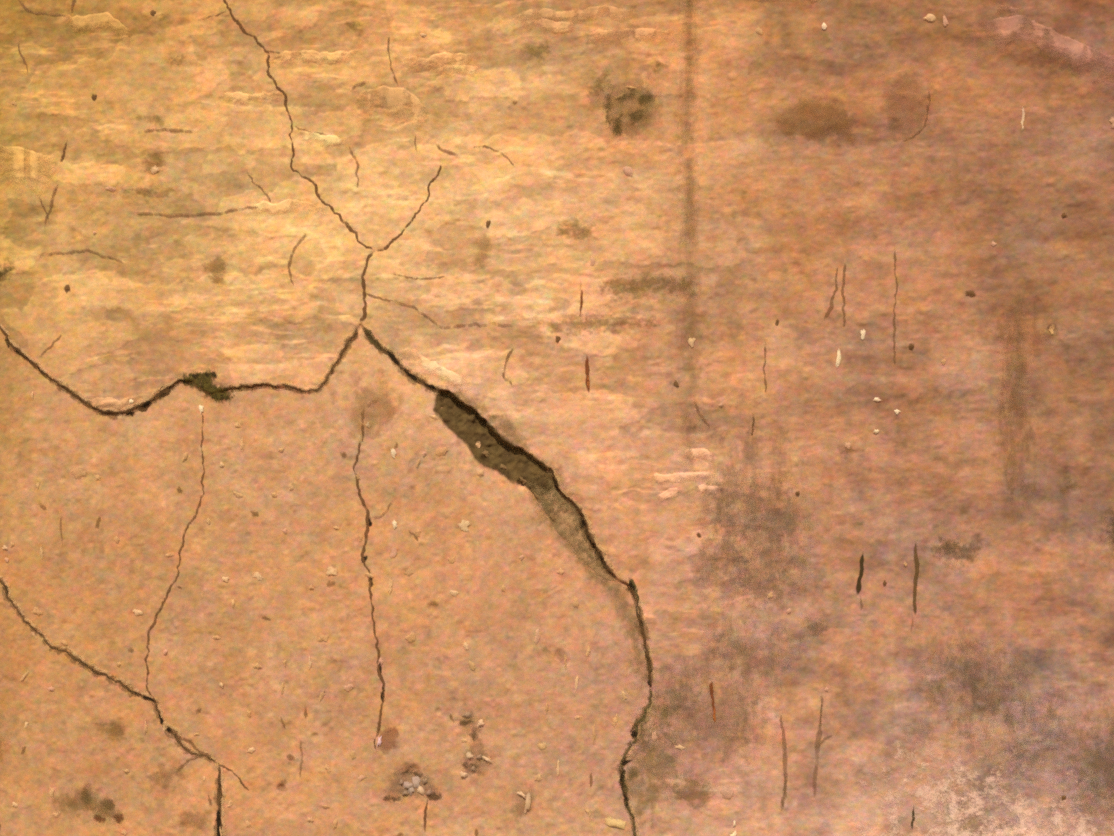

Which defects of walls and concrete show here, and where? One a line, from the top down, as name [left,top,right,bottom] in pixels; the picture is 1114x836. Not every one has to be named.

crack [21,0,76,16]
crack [144,126,191,134]
crack [40,188,57,224]
crack [137,175,271,217]
crack [208,0,513,392]
crack [49,249,122,262]
crack [0,324,184,415]
crack [353,400,392,747]
crack [0,414,248,836]
crack [550,470,655,836]